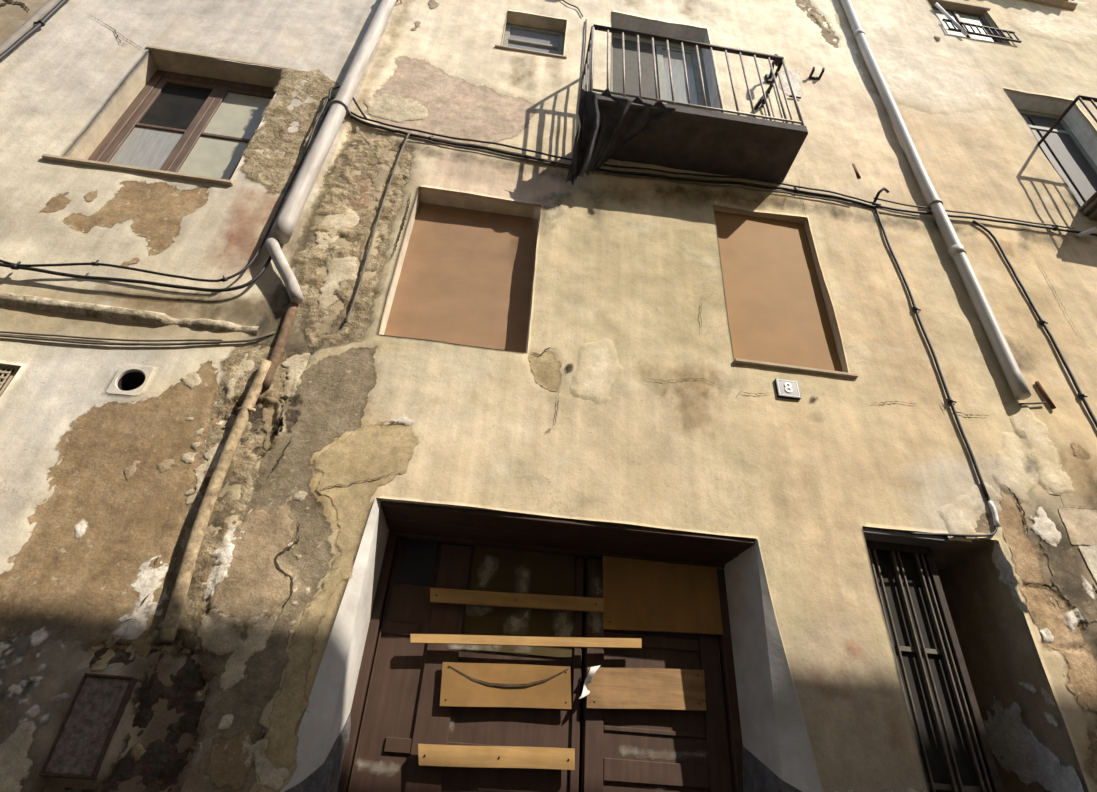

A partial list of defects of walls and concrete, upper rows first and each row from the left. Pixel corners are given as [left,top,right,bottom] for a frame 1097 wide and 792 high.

crack [0,0,29,11]
spalling [795,0,839,48]
peeling [0,56,536,792]
peeling [528,347,573,430]
crack [875,401,988,416]
peeling [936,482,1097,712]
peeling [983,695,1084,792]
peeling [1019,682,1058,727]